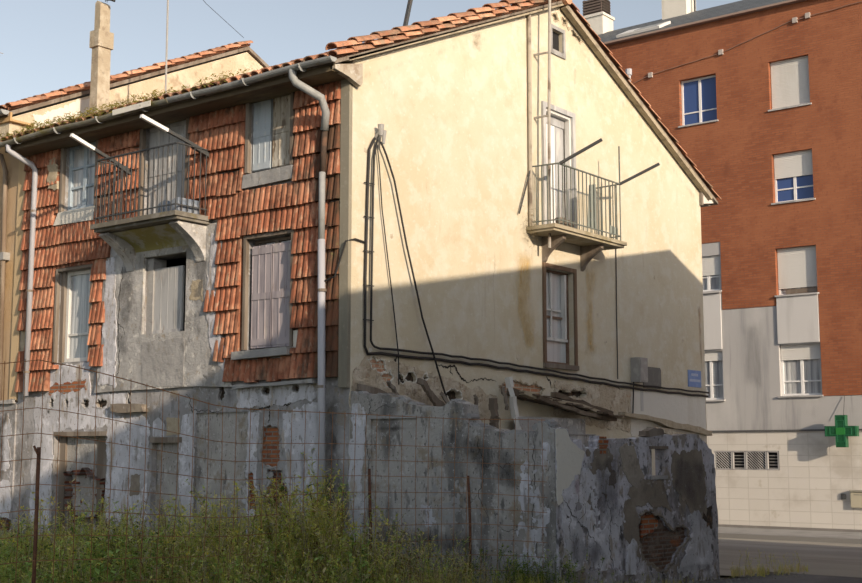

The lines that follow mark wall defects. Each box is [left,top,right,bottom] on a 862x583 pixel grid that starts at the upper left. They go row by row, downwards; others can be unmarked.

flaking render [367,348,429,387]
crack [438,365,494,383]
spalling [446,388,463,402]
peeling [0,362,165,551]
peeling [216,378,326,545]
flaking render [586,436,609,456]
peeling [516,442,715,578]